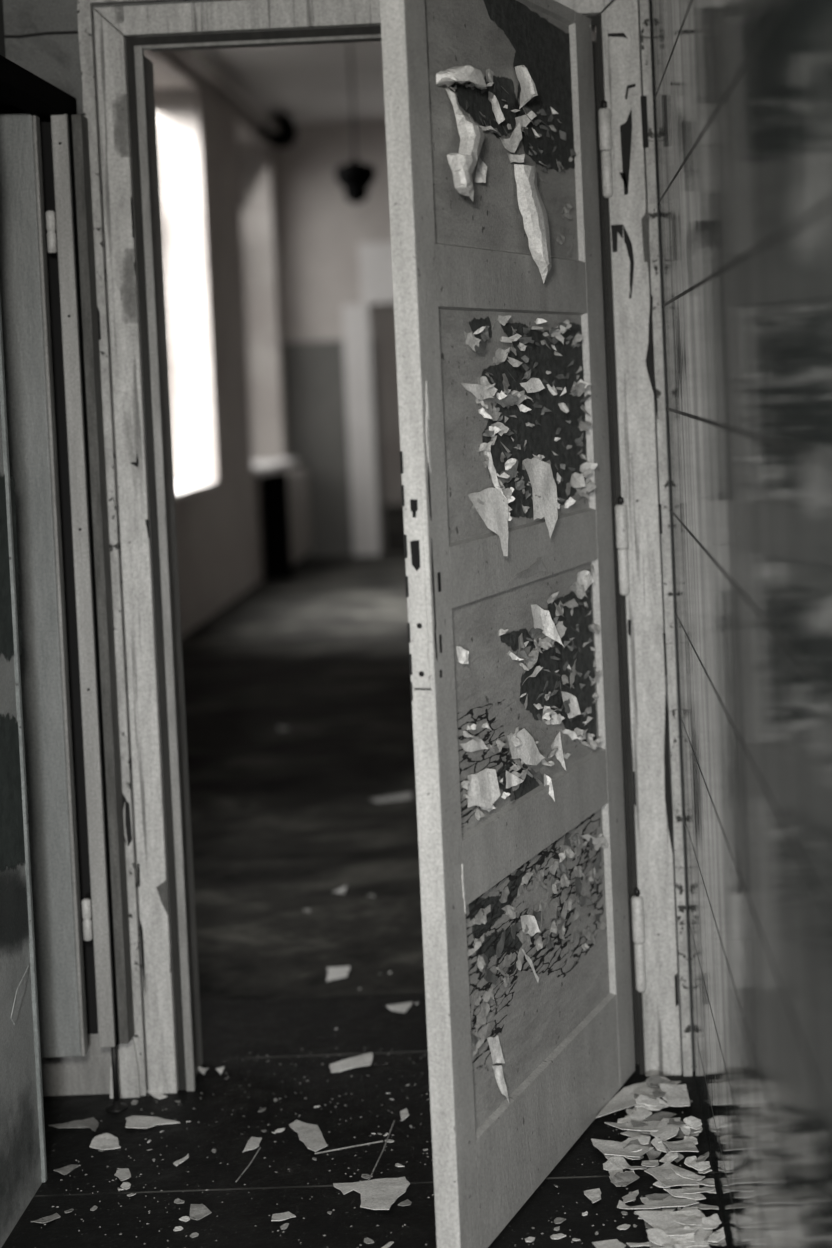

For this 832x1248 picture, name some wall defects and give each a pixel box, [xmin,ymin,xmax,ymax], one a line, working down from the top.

peeling [436,0,576,284]
peeling [0,473,22,661]
peeling [0,713,31,871]